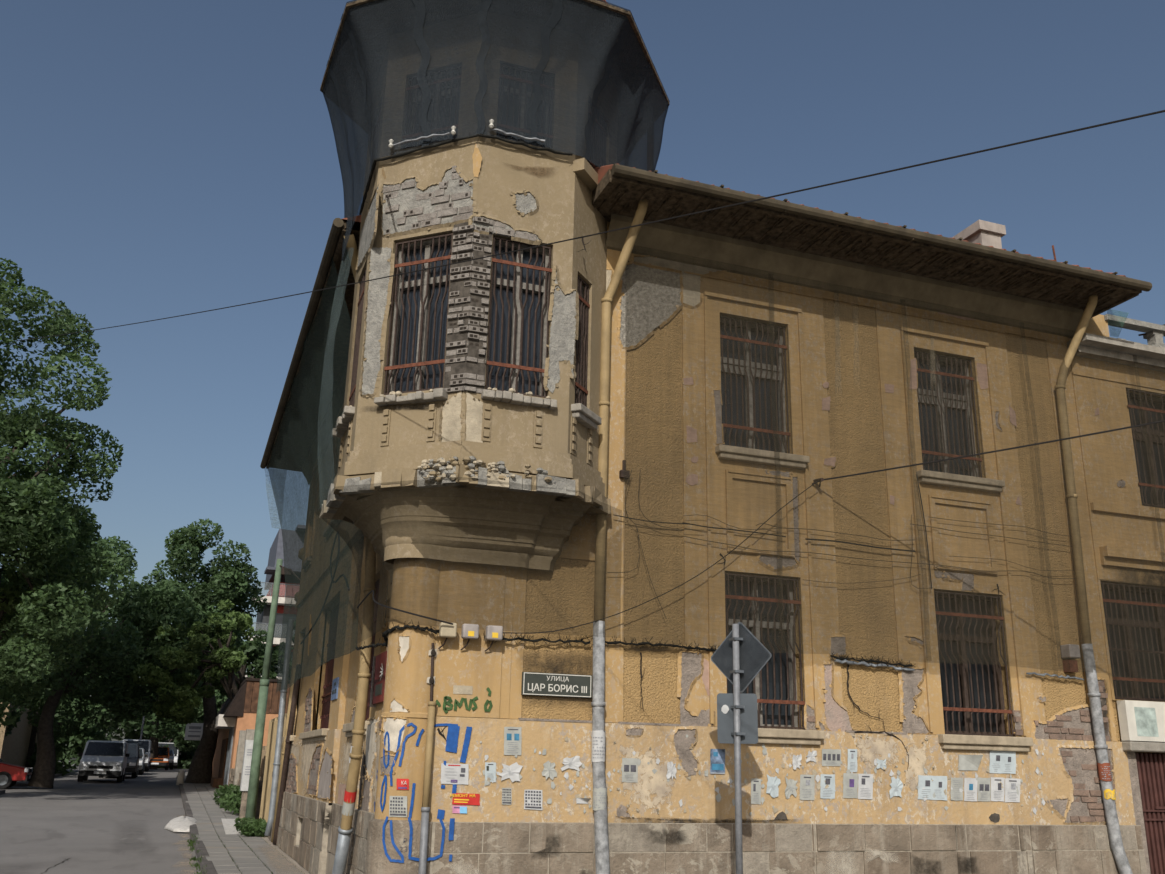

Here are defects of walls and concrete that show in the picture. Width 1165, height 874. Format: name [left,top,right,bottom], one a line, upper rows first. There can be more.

flaking render [356,144,542,443]
peeling [543,265,579,393]
peeling [606,255,727,350]
peeling [285,686,410,812]
peeling [613,649,716,819]
peeling [804,634,935,797]
crack [847,664,909,770]
flaking render [1012,677,1116,825]